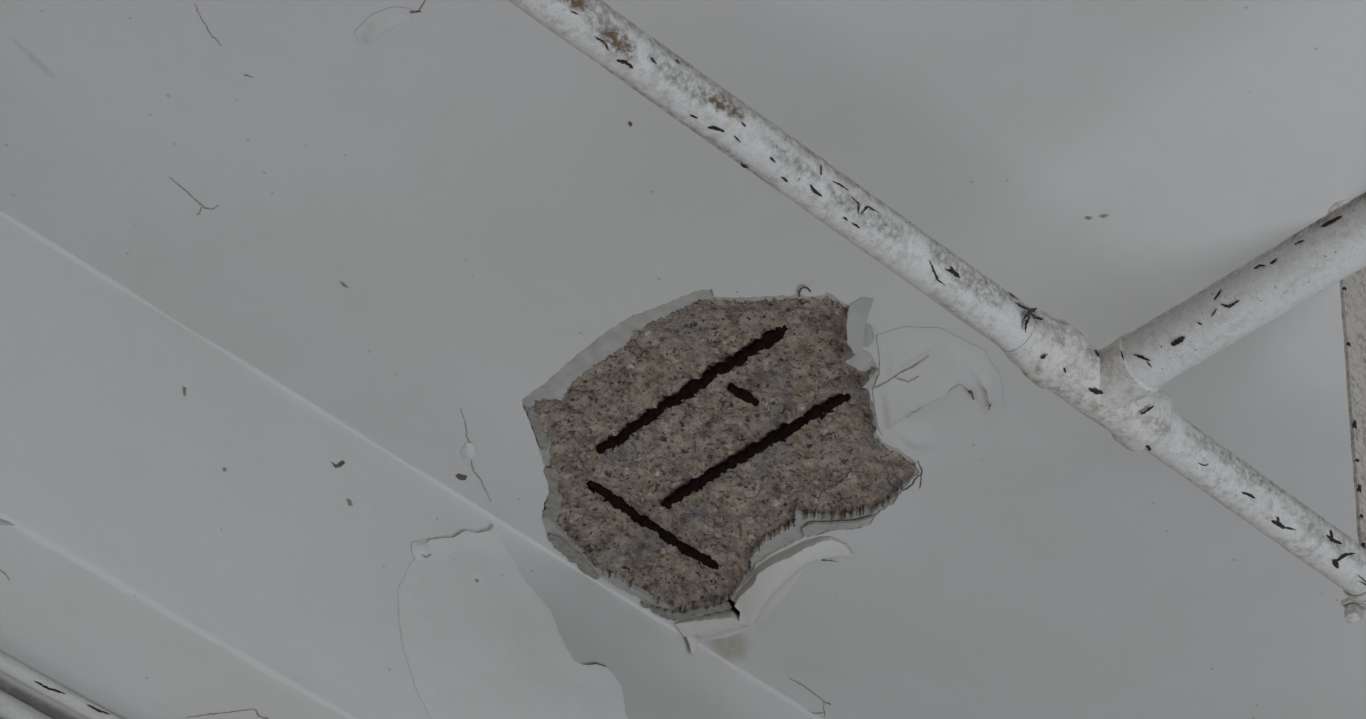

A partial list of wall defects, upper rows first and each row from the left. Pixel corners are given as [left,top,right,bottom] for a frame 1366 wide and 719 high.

peeling [810,165,878,229]
spalling [522,286,923,654]
peeling [398,525,629,719]